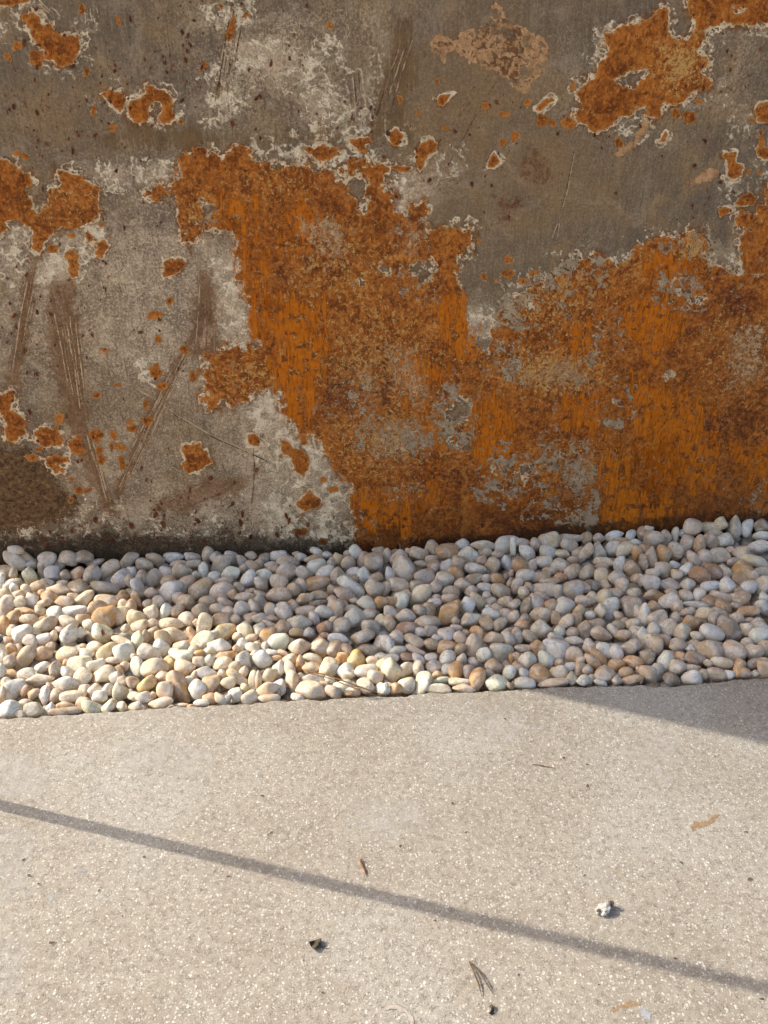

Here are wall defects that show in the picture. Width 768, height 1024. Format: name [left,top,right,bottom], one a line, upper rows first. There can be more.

peeling [430,2,550,94]
peeling [582,13,639,65]
peeling [612,114,651,158]
peeling [683,71,768,210]
corrosion [0,0,768,553]